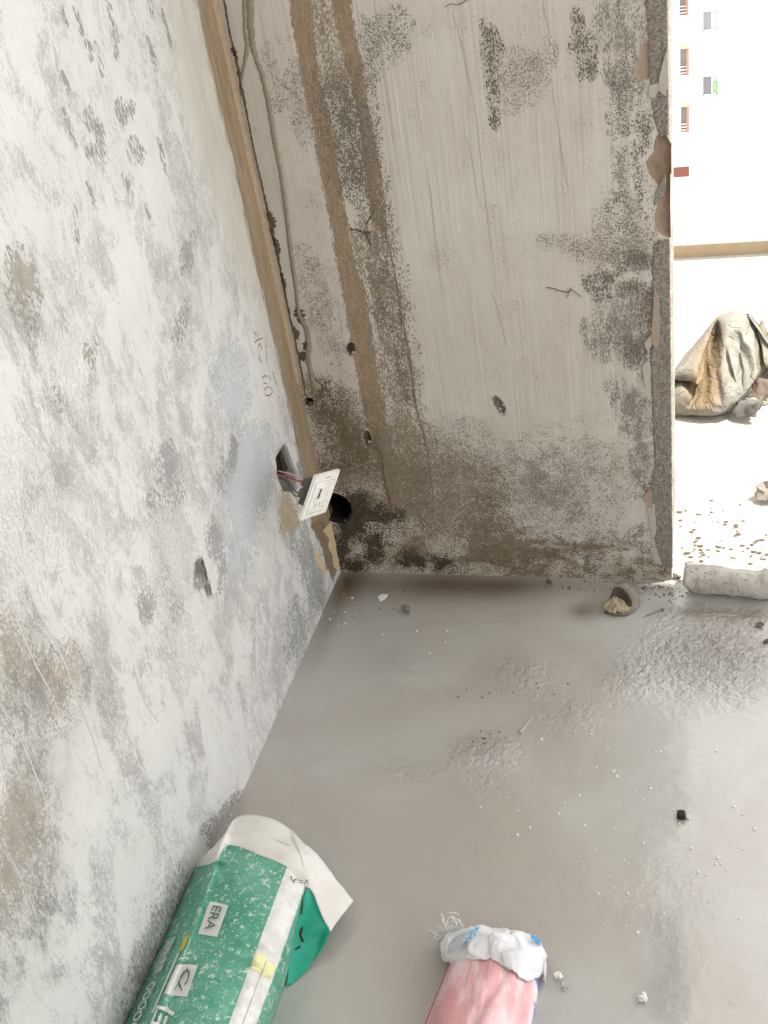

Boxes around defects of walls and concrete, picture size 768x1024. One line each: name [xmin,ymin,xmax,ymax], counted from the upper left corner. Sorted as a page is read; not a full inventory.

peeling [138,585,156,626]
spalling [169,515,227,623]
damp [197,0,683,581]
spalling [409,0,689,568]